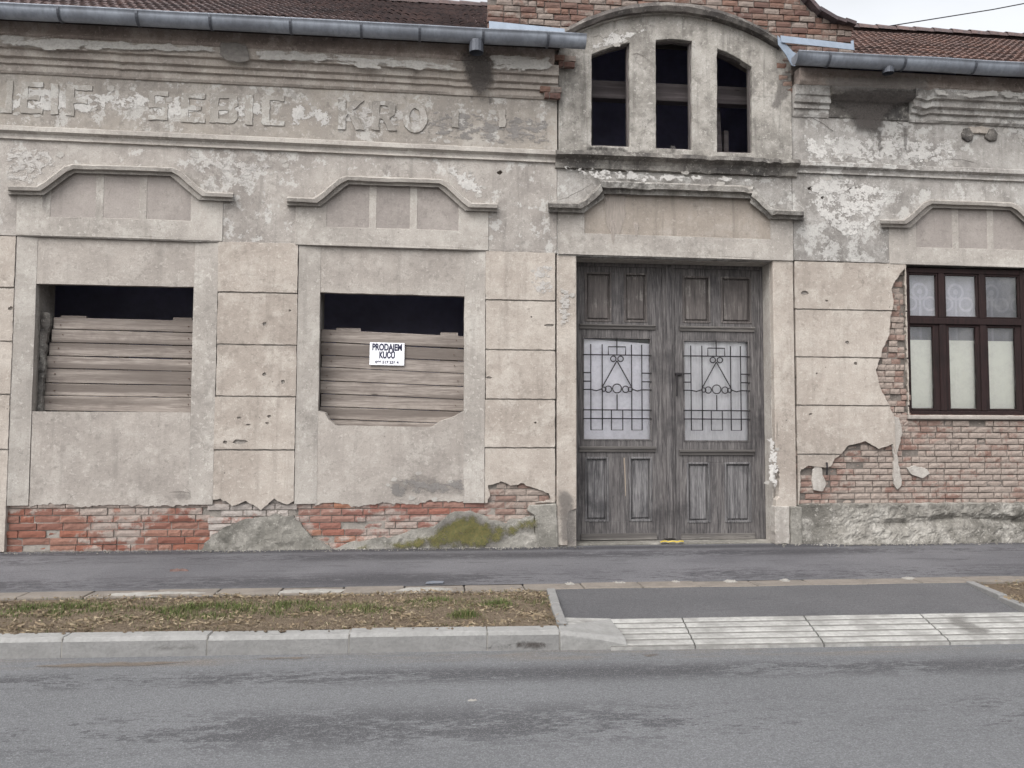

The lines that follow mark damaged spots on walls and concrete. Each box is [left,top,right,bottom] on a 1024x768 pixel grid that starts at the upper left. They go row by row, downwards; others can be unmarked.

damp [462,51,494,94]
peeling [12,85,202,121]
peeling [292,103,332,127]
damp [827,77,927,130]
peeling [803,134,959,166]
peeling [564,166,702,182]
peeling [804,175,891,236]
spalling [796,271,1024,506]
spalling [6,471,557,552]